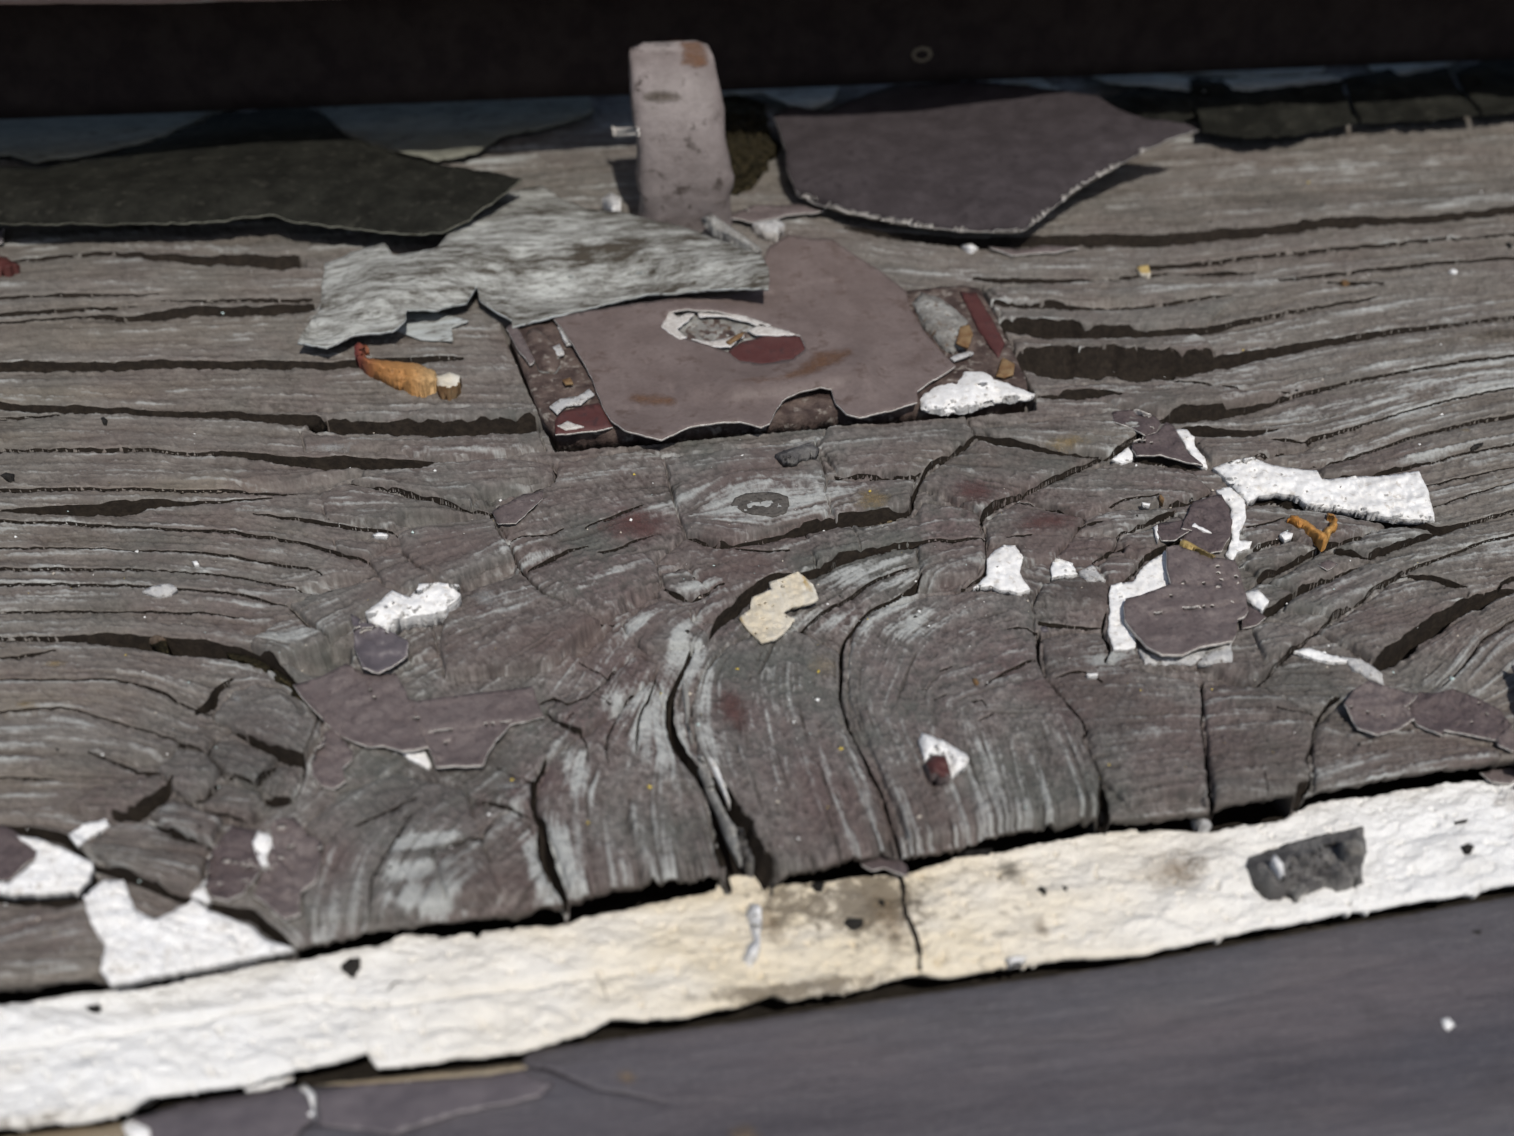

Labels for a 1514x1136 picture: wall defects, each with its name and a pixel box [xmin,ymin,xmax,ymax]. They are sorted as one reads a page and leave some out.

peeling [297,185,955,441]
peeling [1112,409,1203,467]
crack [0,205,1514,971]
peeling [1123,494,1266,657]
peeling [293,614,544,791]
peeling [0,825,37,882]
peeling [205,817,322,921]
peeling [15,1063,554,1136]